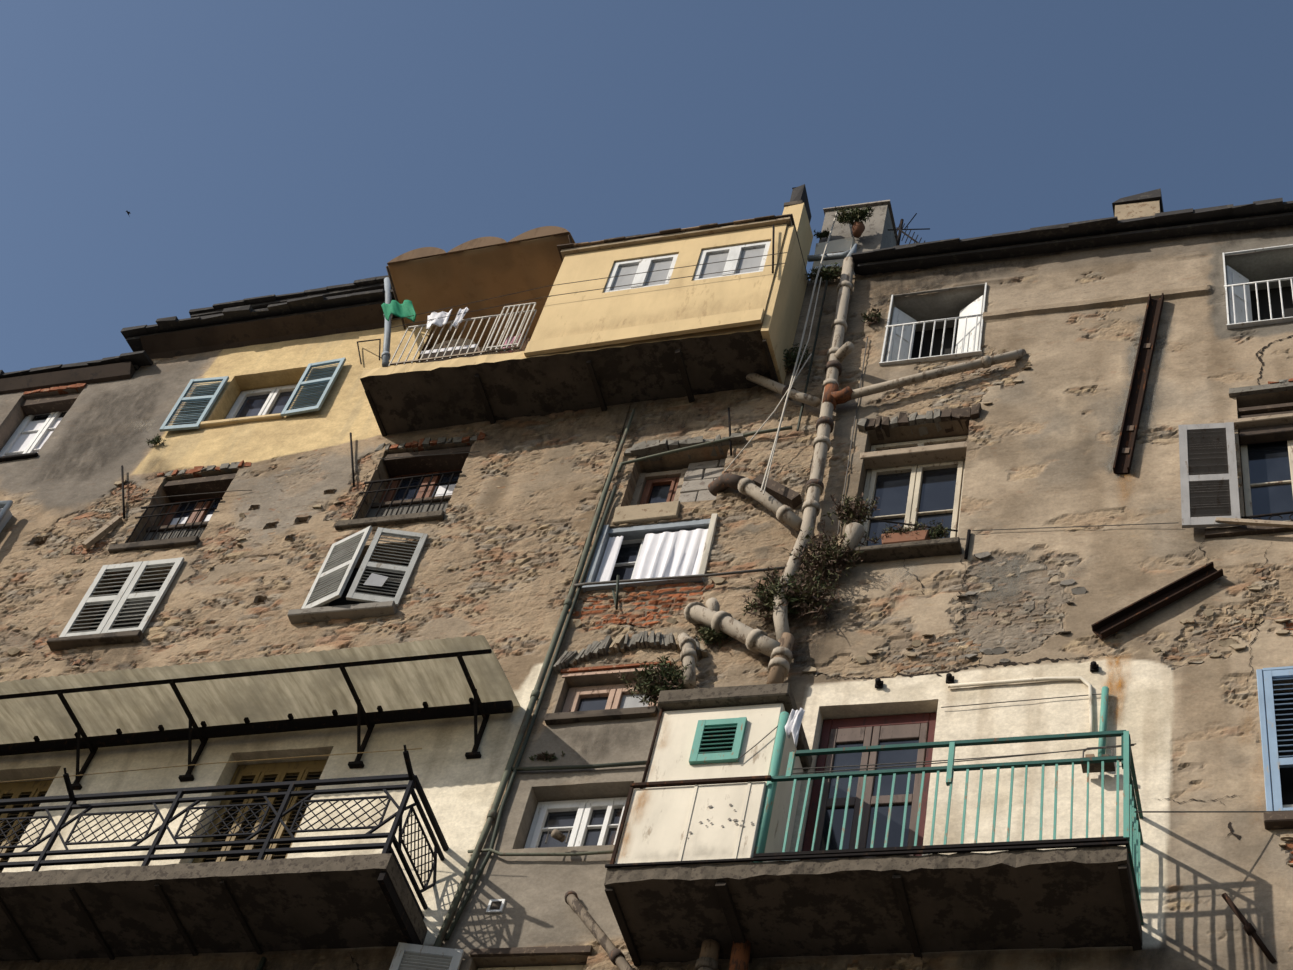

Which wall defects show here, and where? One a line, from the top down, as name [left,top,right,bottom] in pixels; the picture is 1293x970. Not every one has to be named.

crack [1256,335,1293,384]
flaking render [27,480,148,563]
flaking render [181,453,377,584]
spalling [7,626,93,669]
spalling [252,595,267,606]
flaking render [561,571,726,631]
spalling [801,551,1087,680]
spalling [1152,568,1293,669]
flaking render [1279,834,1293,866]